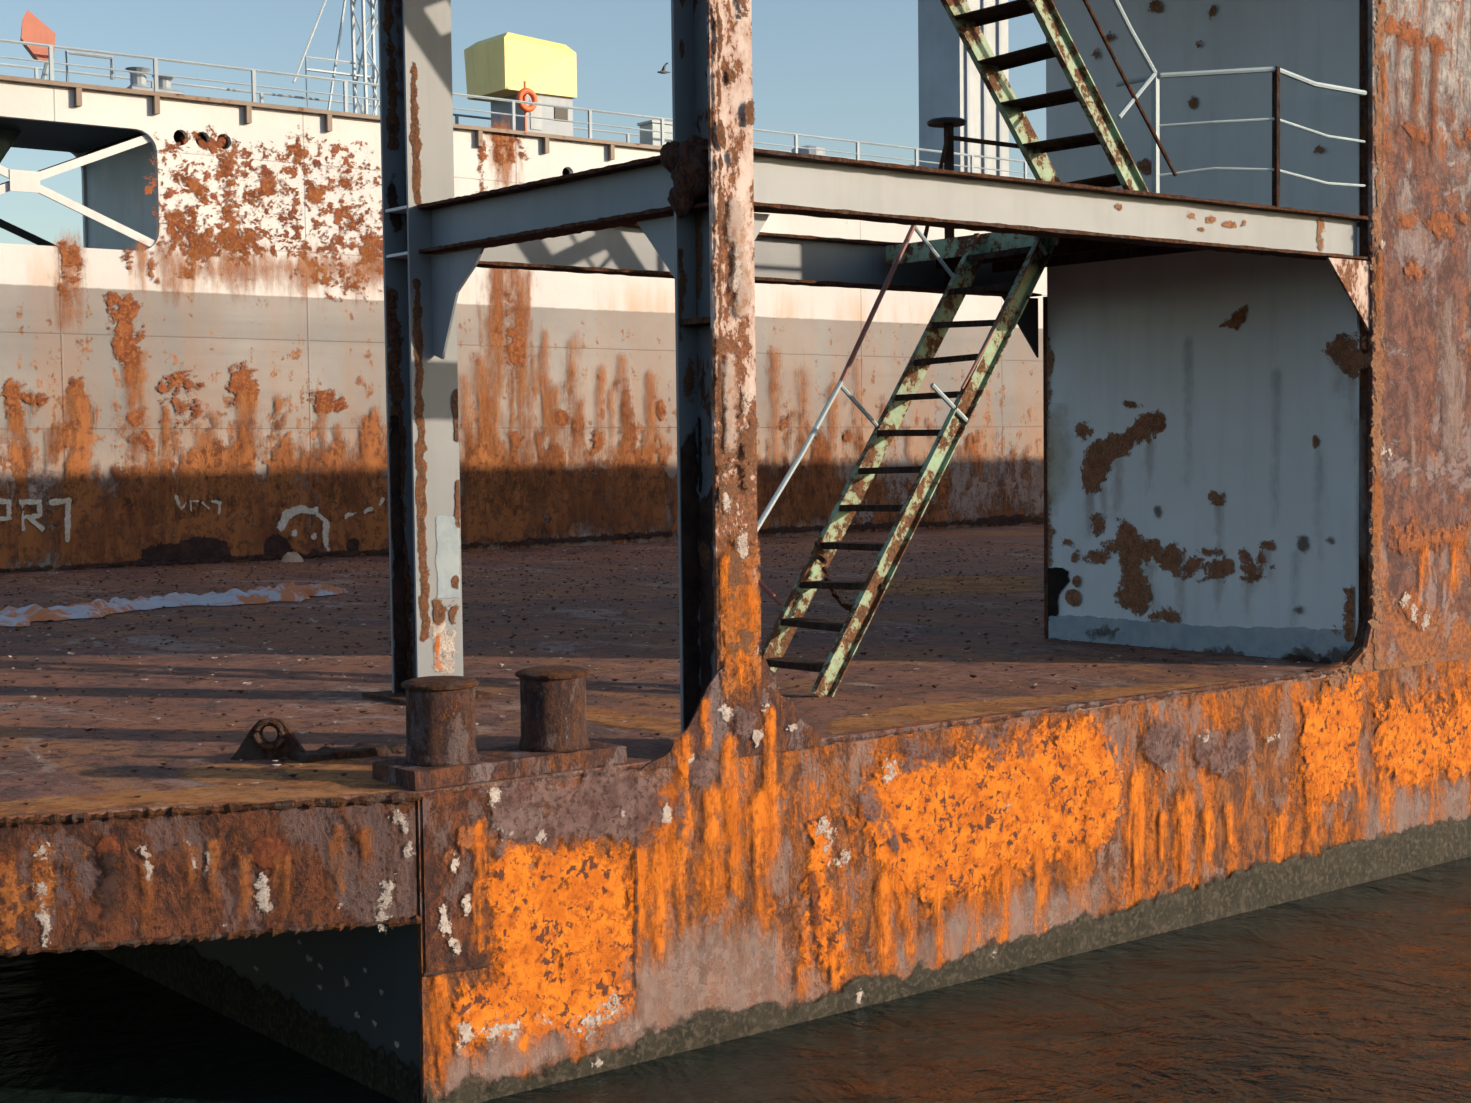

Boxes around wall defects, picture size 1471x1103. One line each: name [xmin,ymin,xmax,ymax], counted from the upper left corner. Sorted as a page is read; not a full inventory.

corrosion [0,0,431,692]
corrosion [451,2,867,733]
corrosion [798,0,1471,990]
corrosion [0,759,401,815]
corrosion [0,834,58,950]
corrosion [95,834,154,920]
corrosion [183,839,220,895]
corrosion [223,834,292,926]
corrosion [435,760,780,1084]